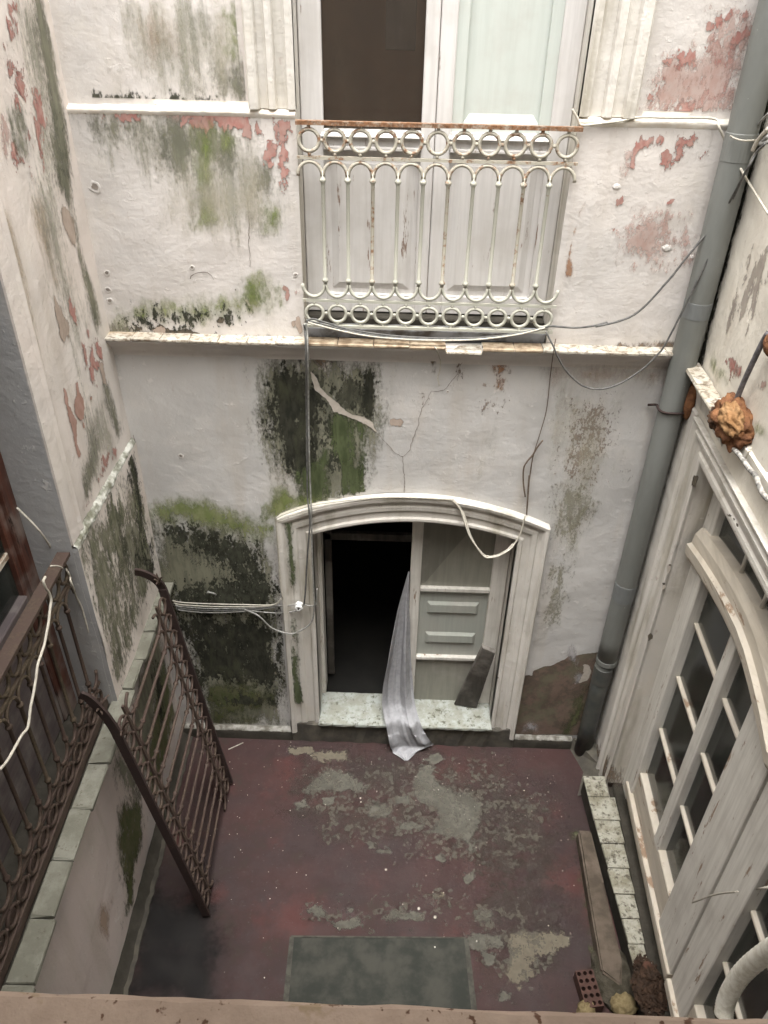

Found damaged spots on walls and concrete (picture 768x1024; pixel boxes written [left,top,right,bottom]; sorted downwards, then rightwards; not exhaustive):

peeling [1,0,47,180]
leakage [25,0,71,295]
leakage [92,115,271,227]
peeling [173,115,293,194]
peeling [625,131,698,176]
peeling [639,5,752,112]
leakage [76,227,266,334]
peeling [54,295,107,458]
leakage [248,358,387,516]
crack [311,363,462,490]
leakage [81,455,303,724]
peeling [288,746,572,1004]